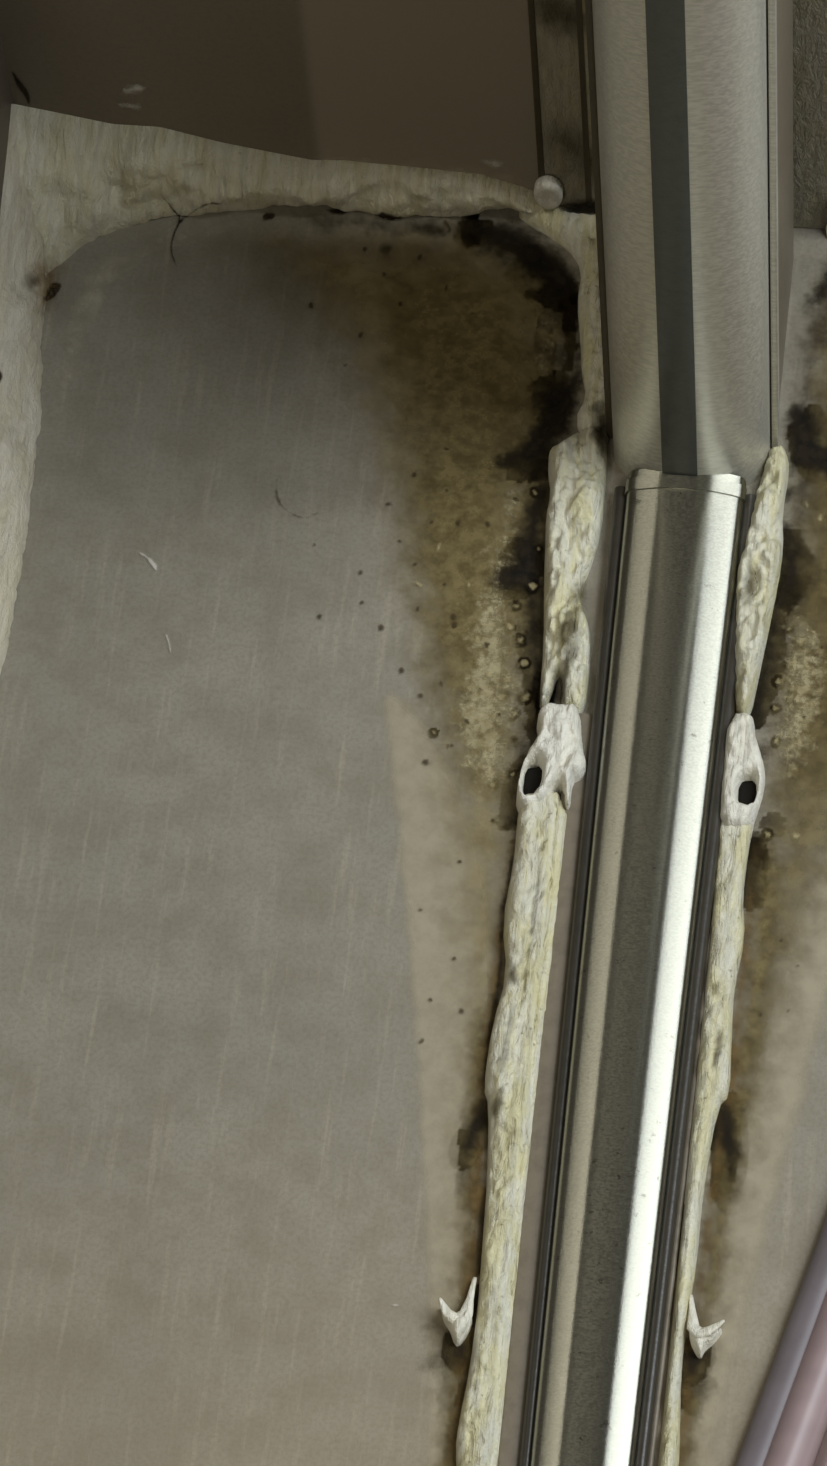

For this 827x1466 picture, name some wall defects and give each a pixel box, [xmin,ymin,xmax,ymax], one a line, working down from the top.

water stain [306,219,580,875]
water stain [713,387,827,1194]
water stain [482,928,503,996]
water stain [465,1014,502,1216]
water stain [455,1236,477,1378]
water stain [679,1351,701,1460]